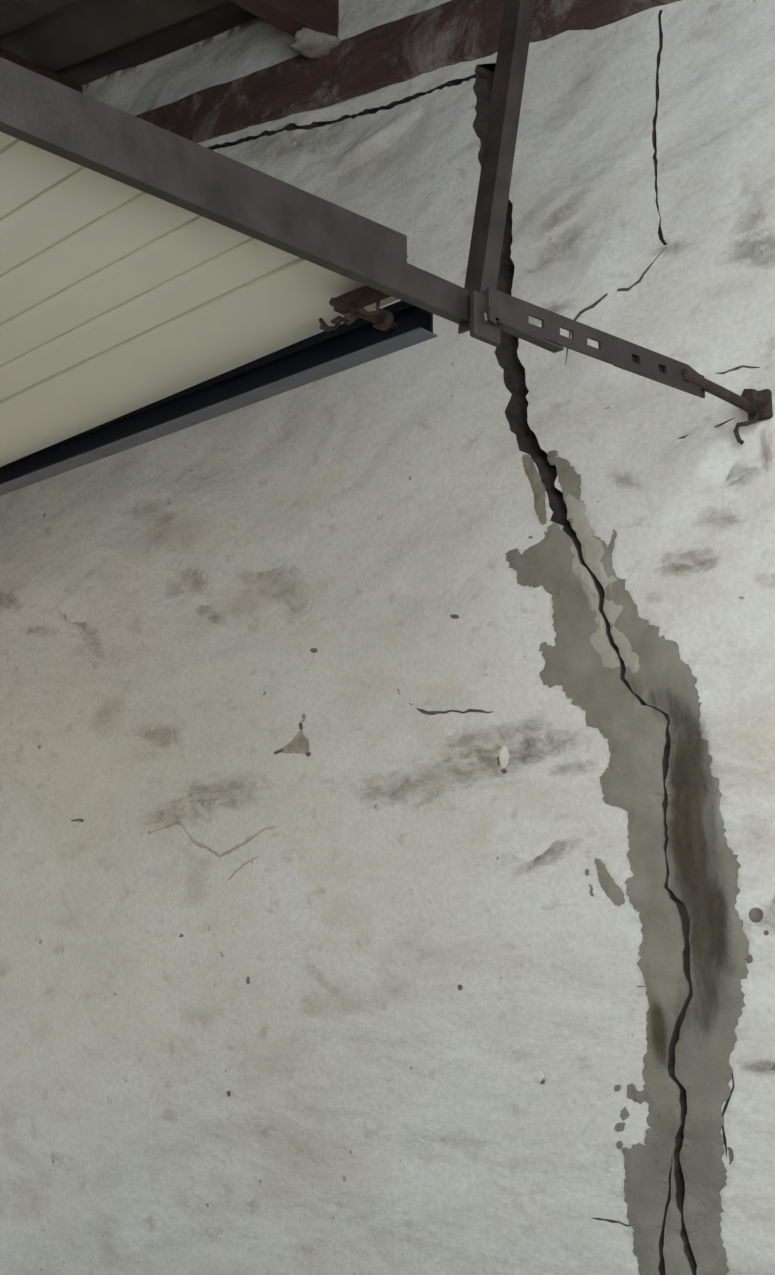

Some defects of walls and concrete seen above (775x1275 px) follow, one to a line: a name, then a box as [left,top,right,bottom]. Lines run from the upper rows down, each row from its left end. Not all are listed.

crack [207,65,495,165]
crack [565,11,668,365]
crack [496,177,515,296]
spalling [522,450,556,525]
peeling [608,529,617,554]
spalling [274,722,311,757]
crack [409,703,494,715]
crack [495,330,697,1275]
crack [148,821,276,880]
peeling [585,858,625,907]
peeling [614,1083,645,1149]
crack [722,1071,734,1158]